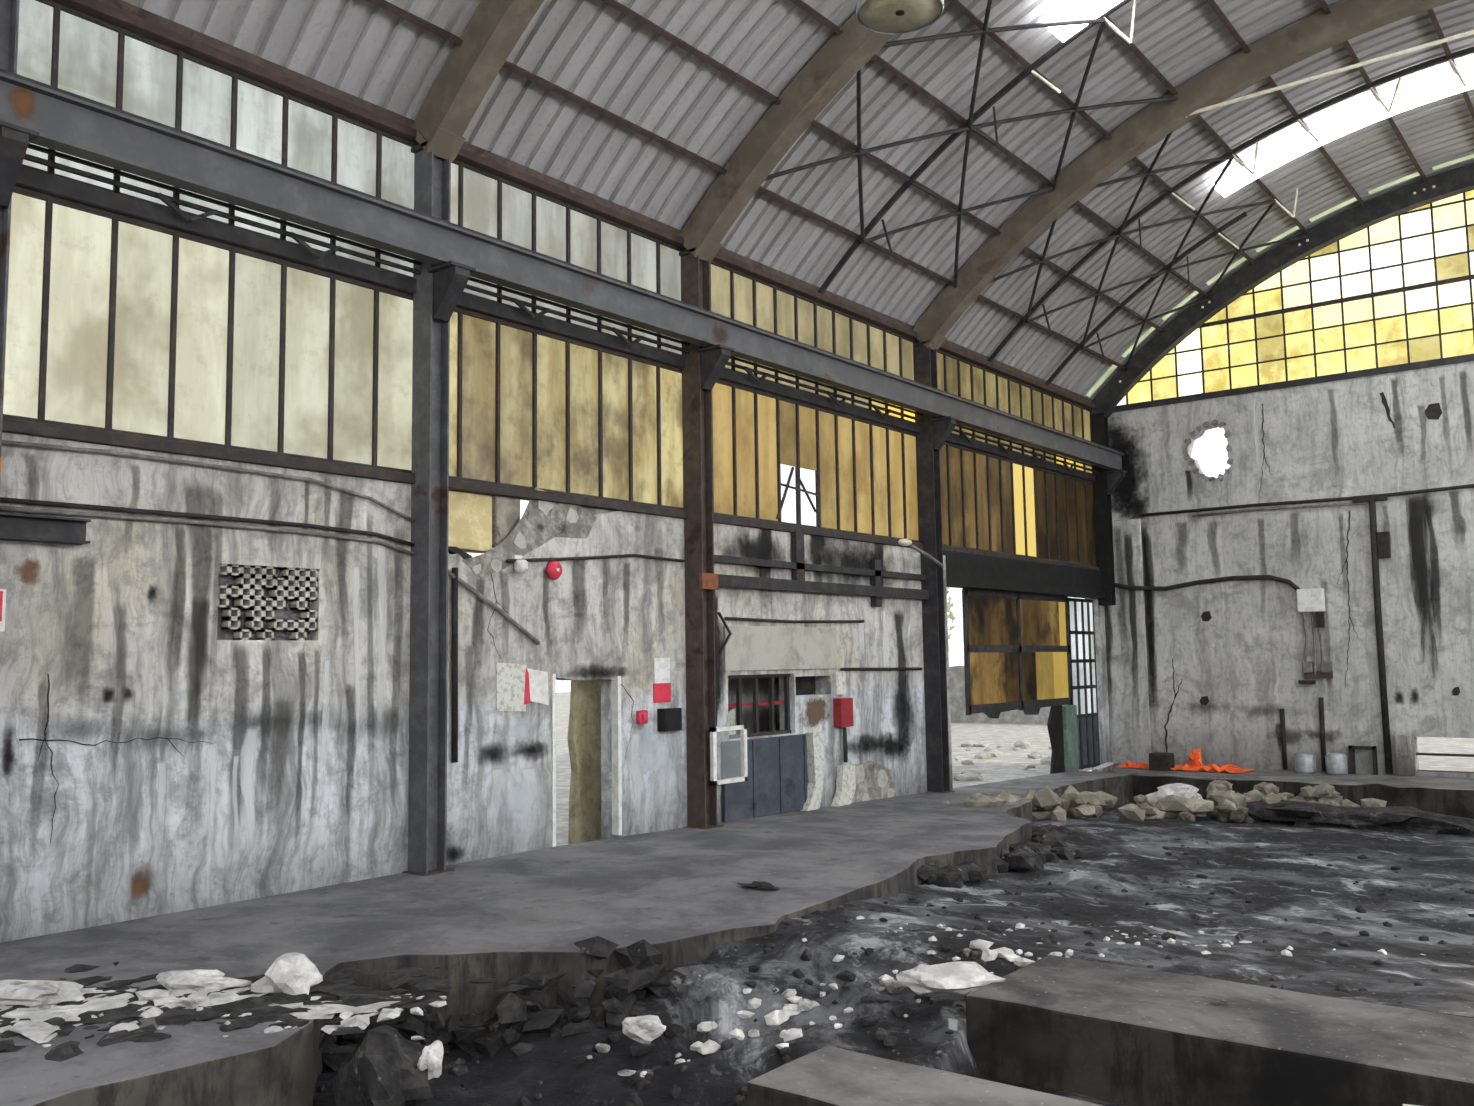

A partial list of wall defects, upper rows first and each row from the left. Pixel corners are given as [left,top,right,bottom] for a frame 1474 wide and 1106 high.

spalling [1182,420,1233,482]
damp [760,529,771,541]
damp [1409,498,1441,629]
damp [1124,528,1156,690]
damp [103,689,132,702]
damp [895,614,907,742]
damp [1104,606,1113,689]
damp [3,729,14,773]
rust [133,871,150,894]